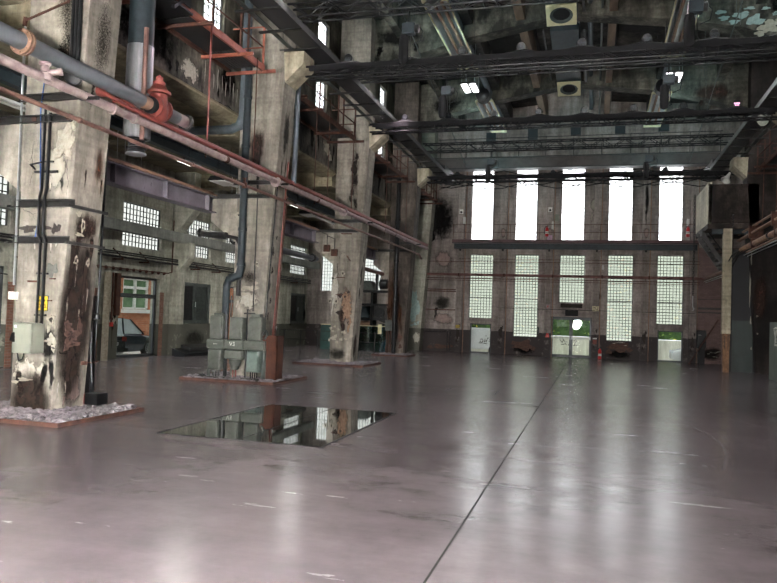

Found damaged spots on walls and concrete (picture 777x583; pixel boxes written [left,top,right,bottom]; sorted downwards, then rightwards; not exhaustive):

damp [58,0,72,56]
damp [95,3,111,69]
spalling [715,6,777,37]
spalling [19,223,61,235]
spalling [328,257,364,315]
spalling [44,315,83,353]